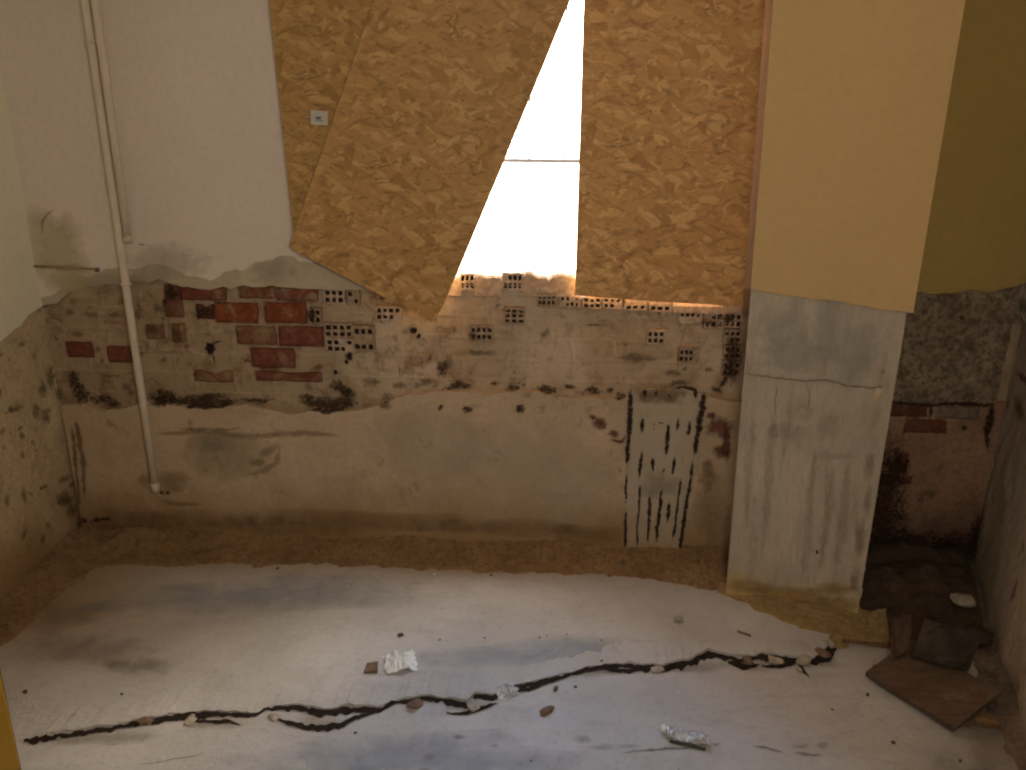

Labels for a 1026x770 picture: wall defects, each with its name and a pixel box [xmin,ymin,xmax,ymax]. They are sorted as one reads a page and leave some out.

peeling [0,0,421,382]
peeling [745,0,1026,566]
flaking render [469,293,743,376]
leakage [33,368,121,422]
leakage [150,388,269,410]
leakage [298,379,358,415]
leakage [437,362,471,390]
leakage [537,384,626,400]
flaking render [666,346,700,384]
spalling [364,661,378,673]
crack [24,624,837,745]
peeling [0,675,20,770]